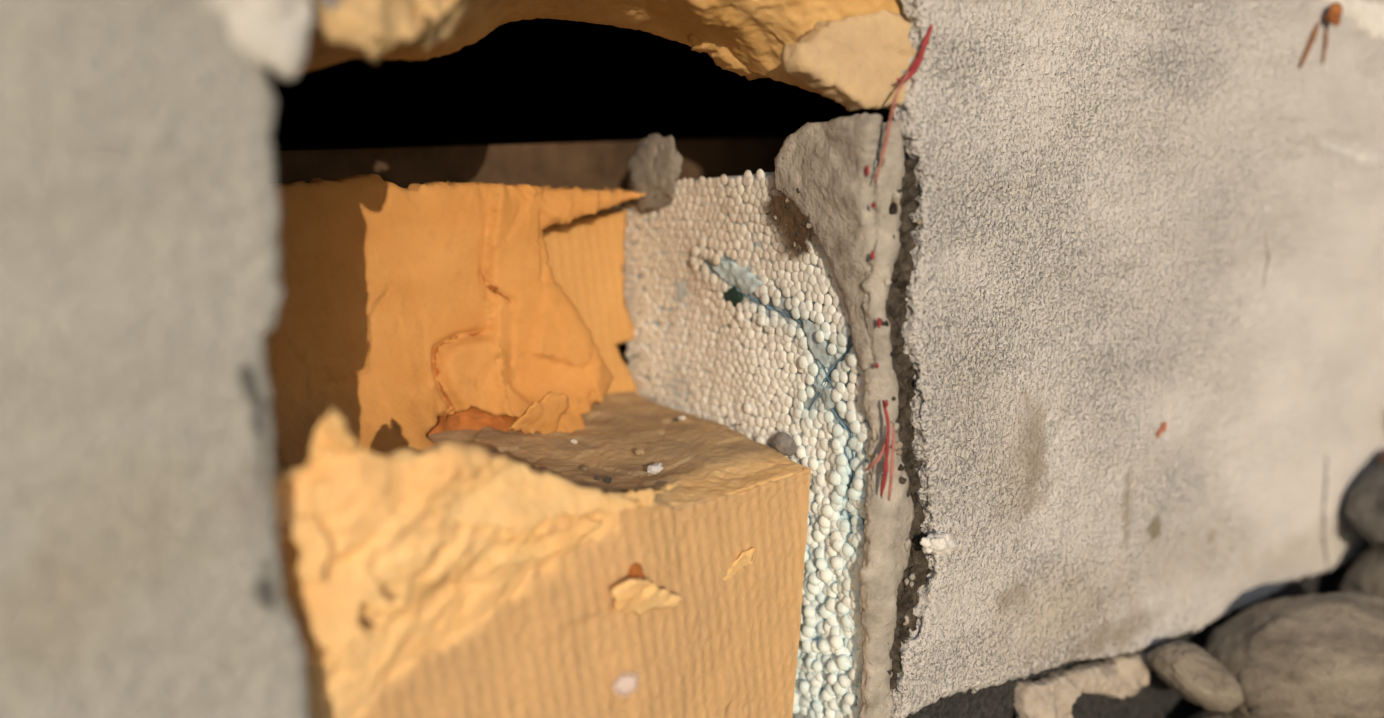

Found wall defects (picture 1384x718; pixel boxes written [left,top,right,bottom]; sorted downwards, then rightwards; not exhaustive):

crack [1326,0,1384,39]
peeling [209,0,314,81]
spalling [723,287,743,307]
spalling [920,530,956,559]
peeling [610,562,683,615]